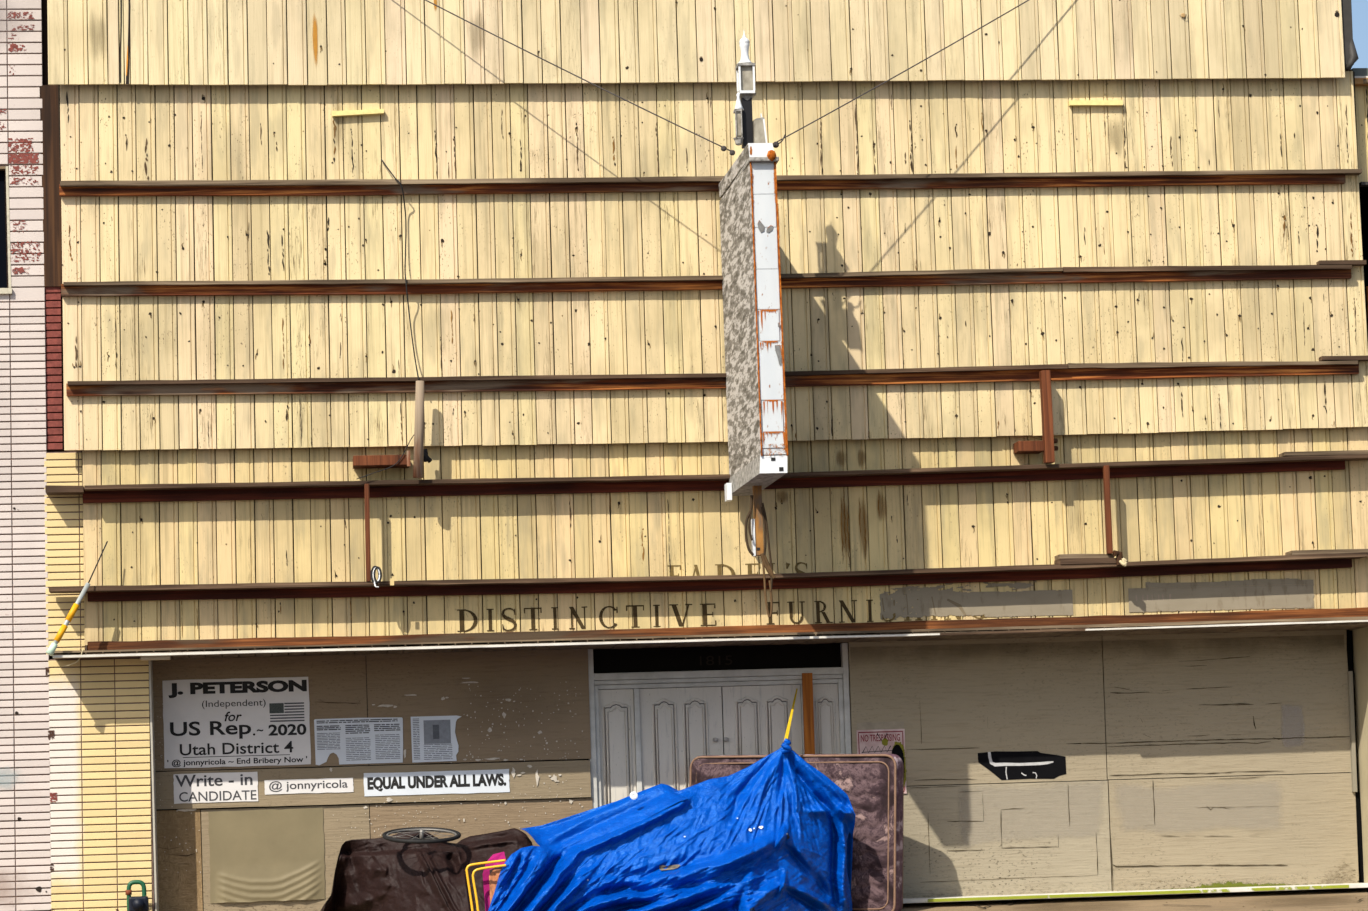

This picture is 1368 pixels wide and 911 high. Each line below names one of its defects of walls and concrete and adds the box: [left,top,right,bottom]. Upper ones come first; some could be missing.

peeling [0,109,39,185]
peeling [10,220,42,274]
rust [758,309,783,364]
rust [760,383,786,456]